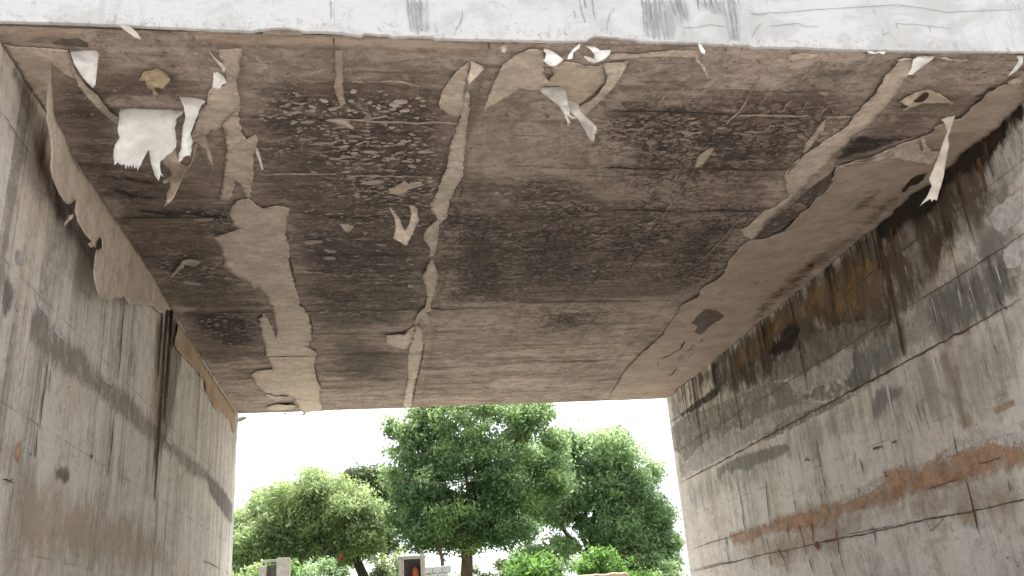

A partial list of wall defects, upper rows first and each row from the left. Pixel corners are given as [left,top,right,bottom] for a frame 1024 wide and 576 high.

peeling [114,23,141,39]
peeling [2,28,1024,433]
damp [671,105,1024,481]
damp [31,314,232,519]
crack [725,483,770,571]
peeling [688,349,854,471]
rust [729,439,1024,574]
crack [927,432,980,535]